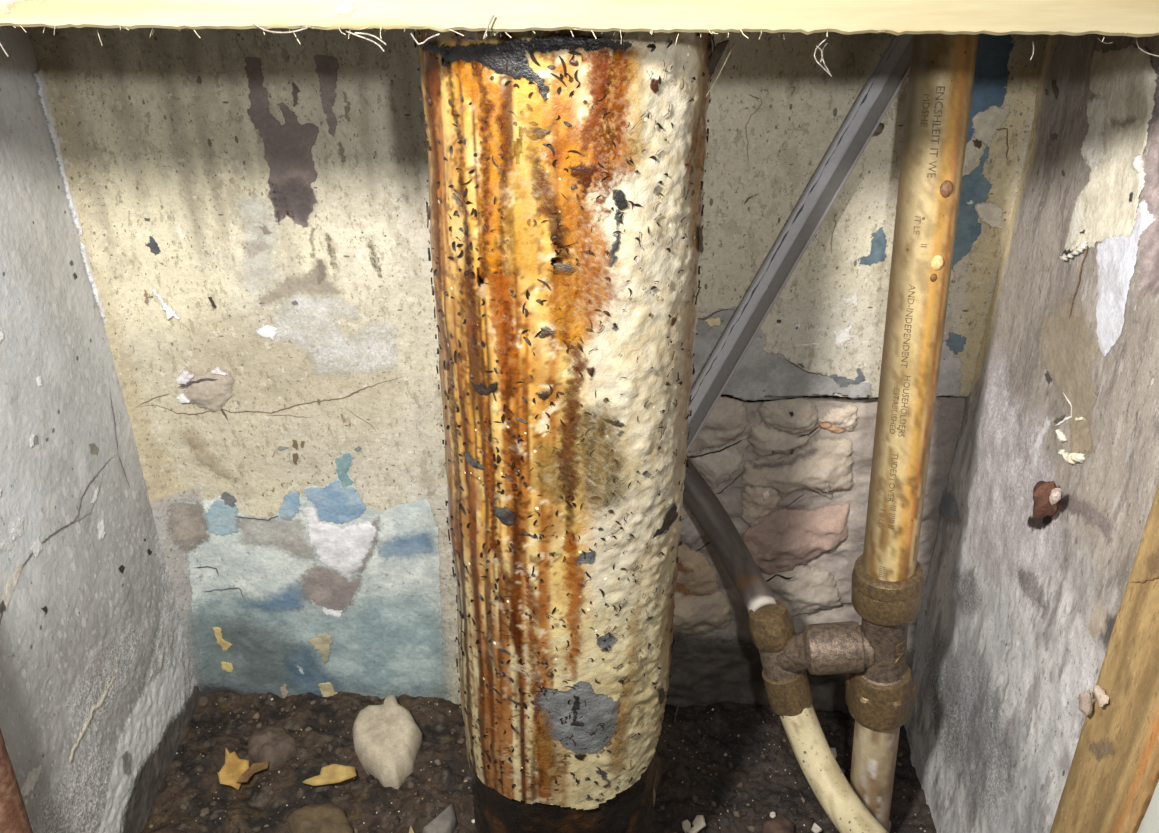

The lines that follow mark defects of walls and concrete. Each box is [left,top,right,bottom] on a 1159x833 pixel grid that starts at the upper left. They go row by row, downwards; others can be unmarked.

corrosion [686,115,704,244]
peeling [859,227,887,266]
peeling [949,33,1014,292]
peeling [1060,44,1159,357]
crack [0,377,401,622]
peeling [278,440,305,465]
peeling [144,446,447,713]
corrosion [424,47,644,795]
spalling [653,499,754,647]
spalling [687,322,878,634]
spalling [917,332,967,598]
peeling [533,681,620,760]